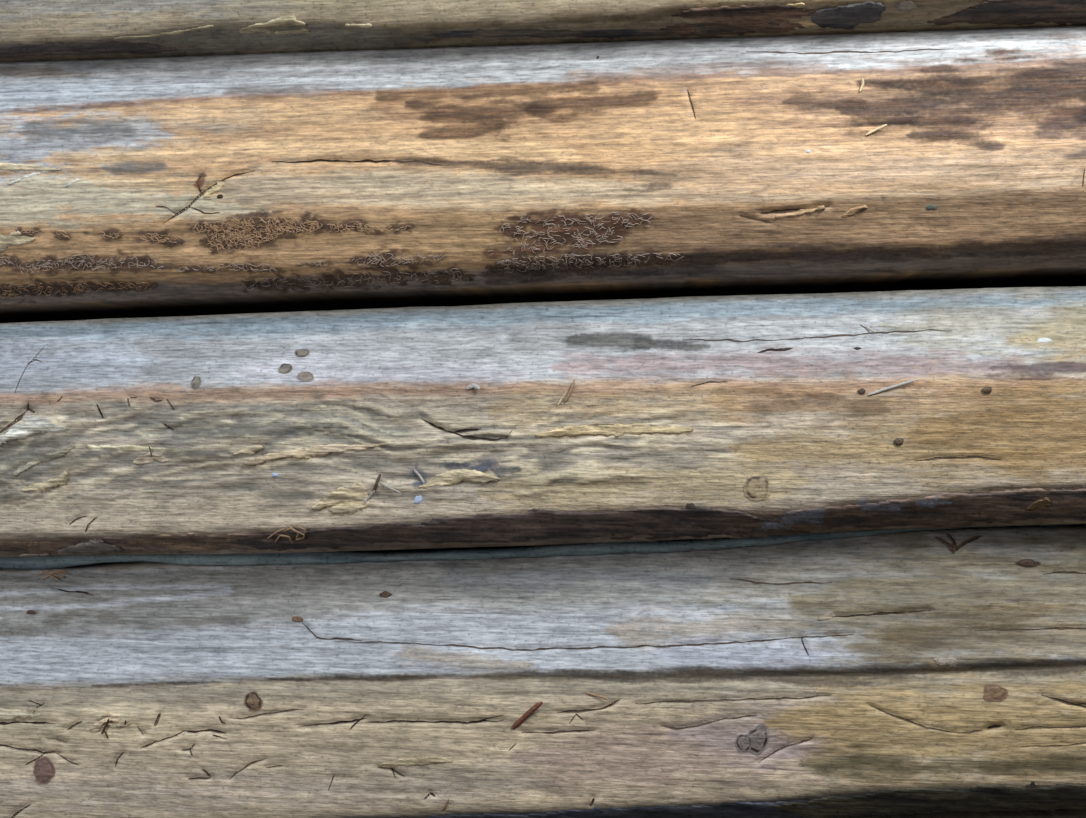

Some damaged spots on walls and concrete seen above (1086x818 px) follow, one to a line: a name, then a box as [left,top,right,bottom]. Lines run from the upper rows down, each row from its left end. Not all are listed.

leakage [376,82,657,138]
leakage [836,49,1086,149]
crack [279,158,439,166]
crack [301,610,928,655]